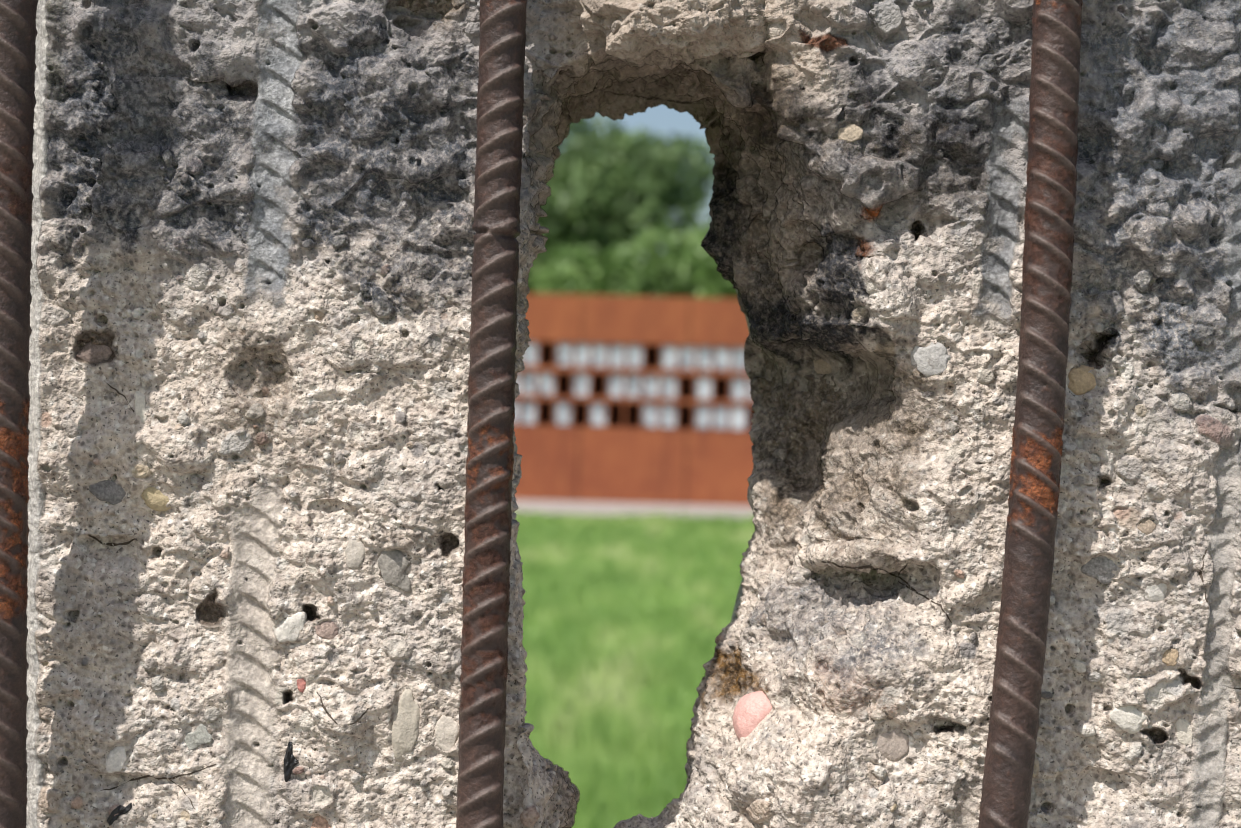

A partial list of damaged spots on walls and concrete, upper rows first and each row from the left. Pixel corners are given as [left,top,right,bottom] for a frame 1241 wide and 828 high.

leakage [45,5,254,253]
leakage [296,16,478,312]
spalling [911,221,924,240]
leakage [1074,0,1241,392]
rust [0,400,30,617]
rust [462,504,512,641]
rust [1007,426,1064,523]